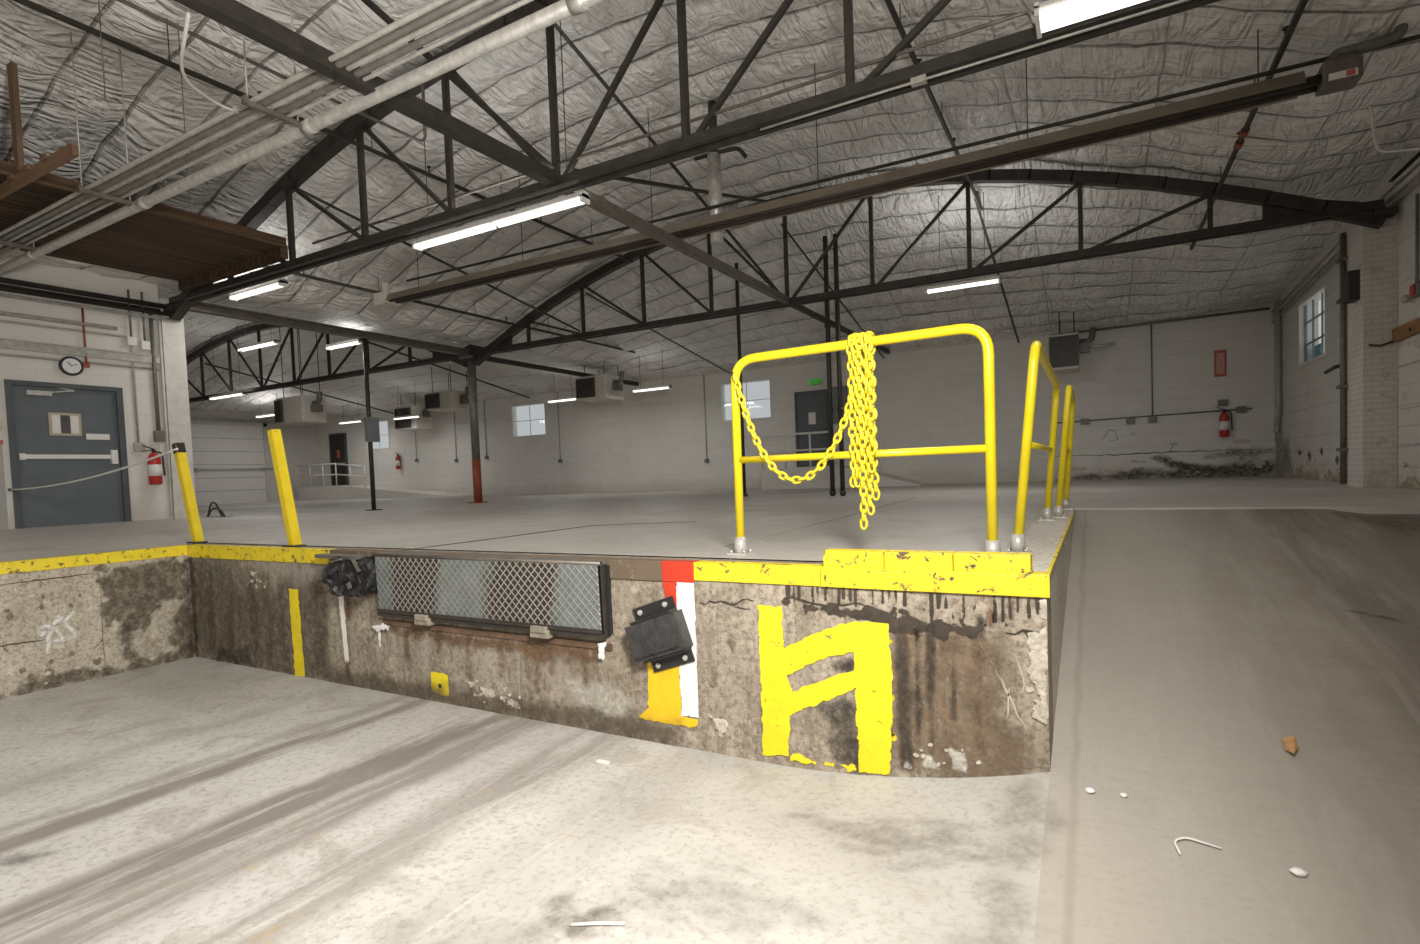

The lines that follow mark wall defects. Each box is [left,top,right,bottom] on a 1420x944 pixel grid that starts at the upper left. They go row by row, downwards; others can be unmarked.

leakage [95,558,674,746]
leakage [782,585,1040,778]